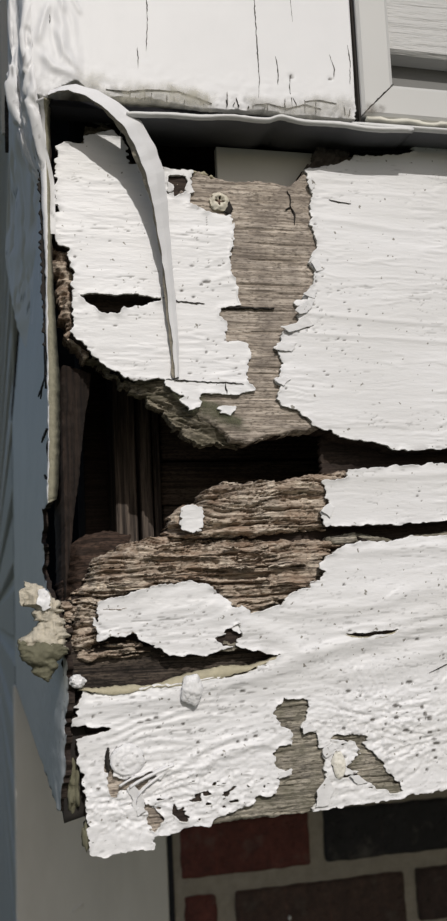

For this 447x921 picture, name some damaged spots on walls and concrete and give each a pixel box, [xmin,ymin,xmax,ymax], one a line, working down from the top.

crack [106,0,350,117]
peeling [167,171,323,448]
peeling [160,471,347,540]
peeling [215,624,243,651]
peeling [104,760,174,832]
peeling [212,698,402,824]